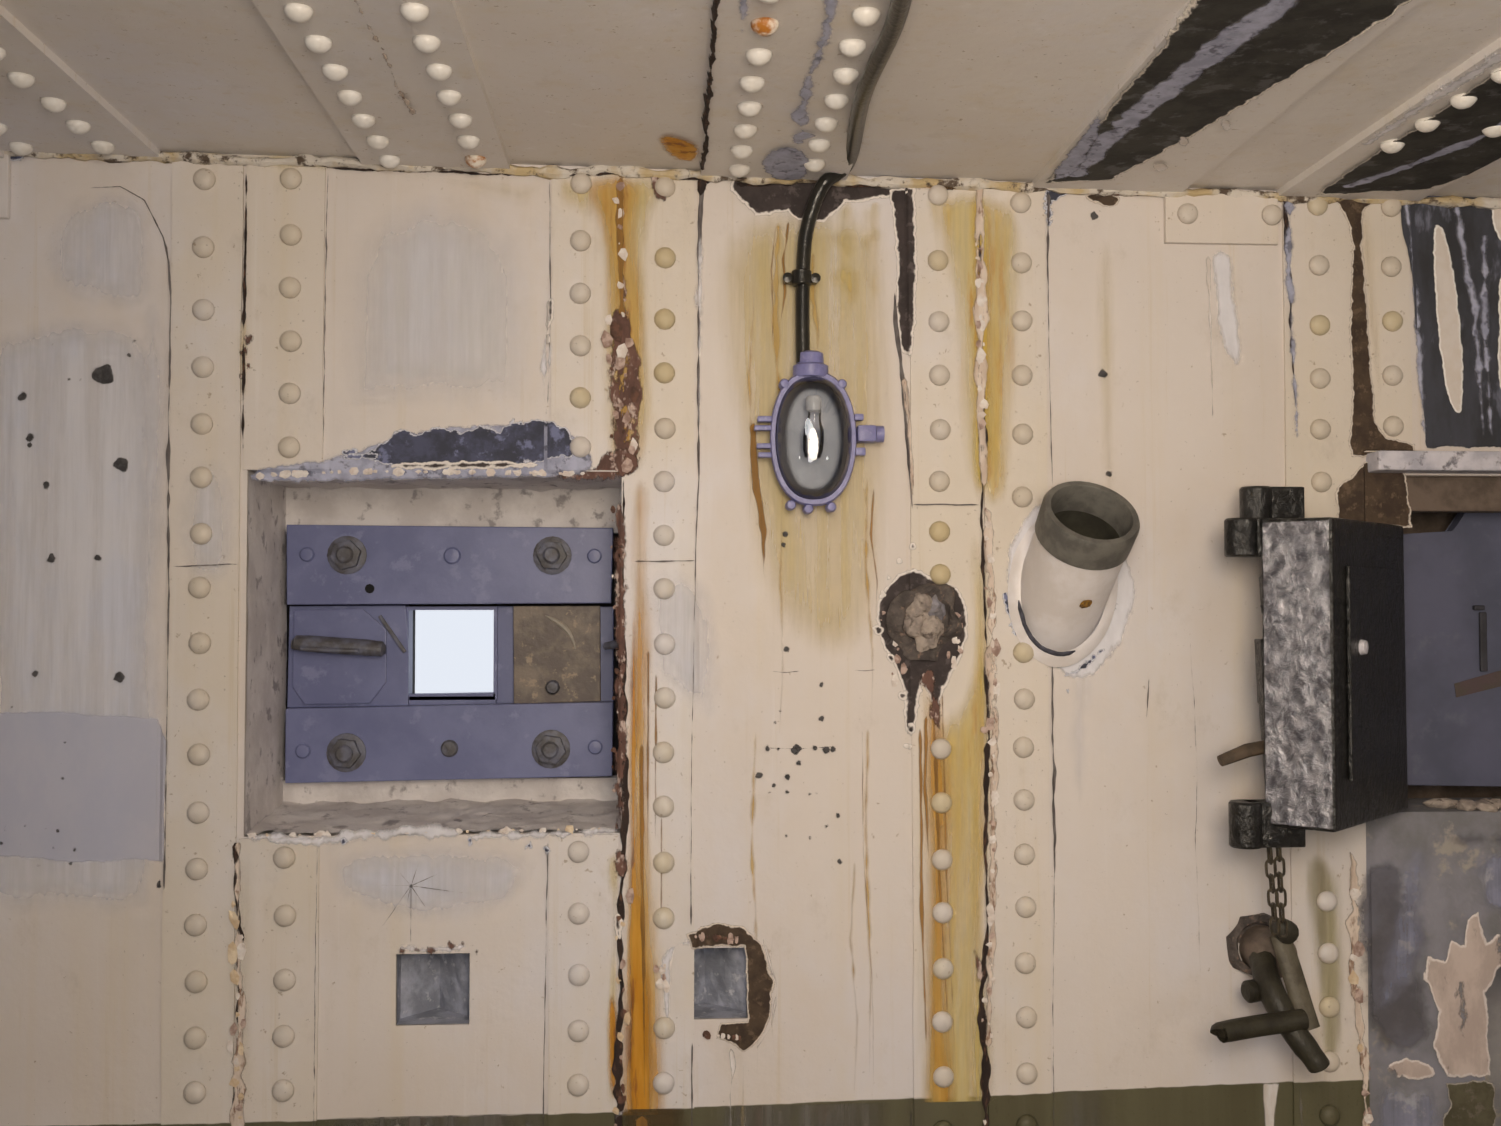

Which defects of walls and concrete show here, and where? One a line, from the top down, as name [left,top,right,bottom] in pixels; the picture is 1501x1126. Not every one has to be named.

crack [763,0,838,180]
crack [227,843,246,1126]
peeling [251,419,592,482]
rust [557,181,648,480]
rust [610,504,678,1126]
crack [549,0,748,1126]
spalling [755,744,836,793]
rust [745,223,877,604]
peeling [872,542,968,749]
rust [919,690,982,1102]
crack [915,187,1001,1126]
peeling [1317,54,1501,528]